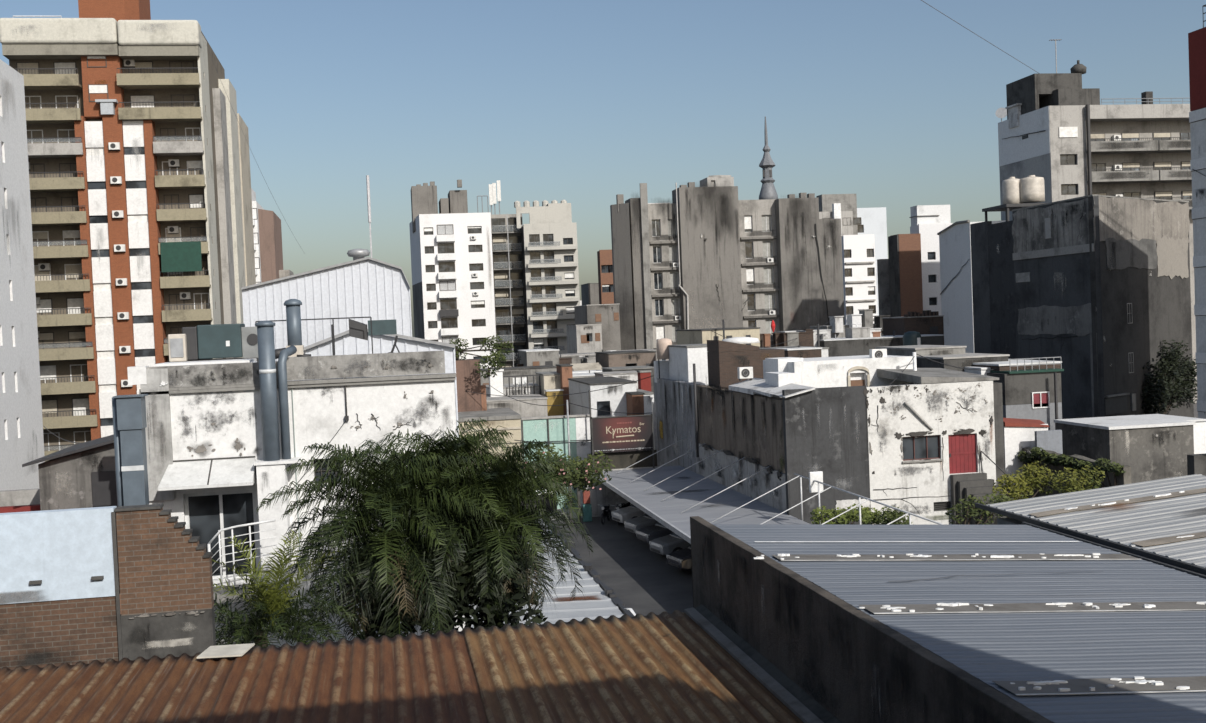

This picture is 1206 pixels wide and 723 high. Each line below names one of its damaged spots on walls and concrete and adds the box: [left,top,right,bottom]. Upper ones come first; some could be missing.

leakage [182,370,259,435]
leakage [403,395,447,427]
peeling [863,383,994,464]